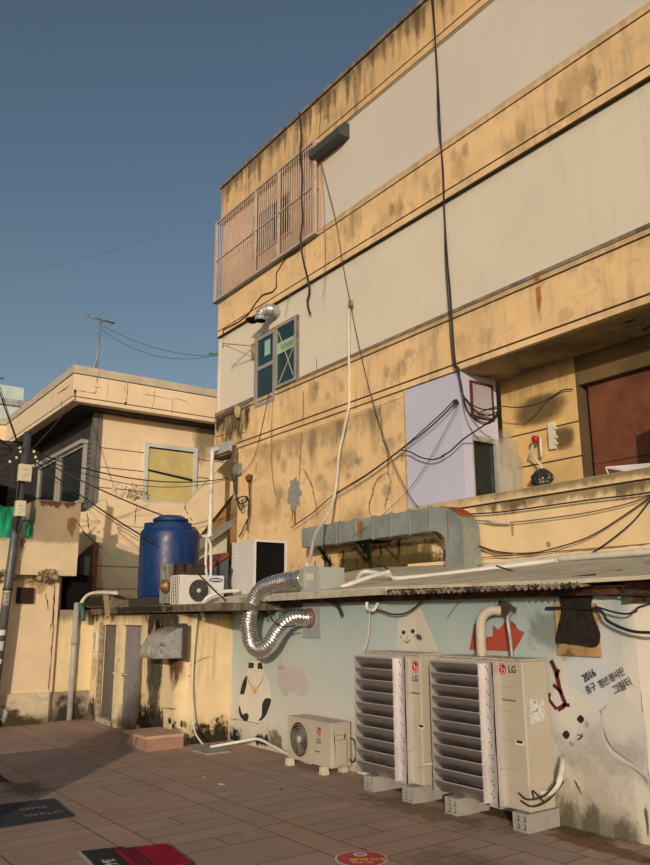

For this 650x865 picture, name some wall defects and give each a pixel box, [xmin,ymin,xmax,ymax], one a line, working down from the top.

spalling [287,477,302,511]
spalling [35,568,59,583]
leakage [136,658,163,728]
leakage [0,706,40,727]
leakage [54,695,95,721]
leakage [187,716,241,745]
leakage [255,730,282,749]